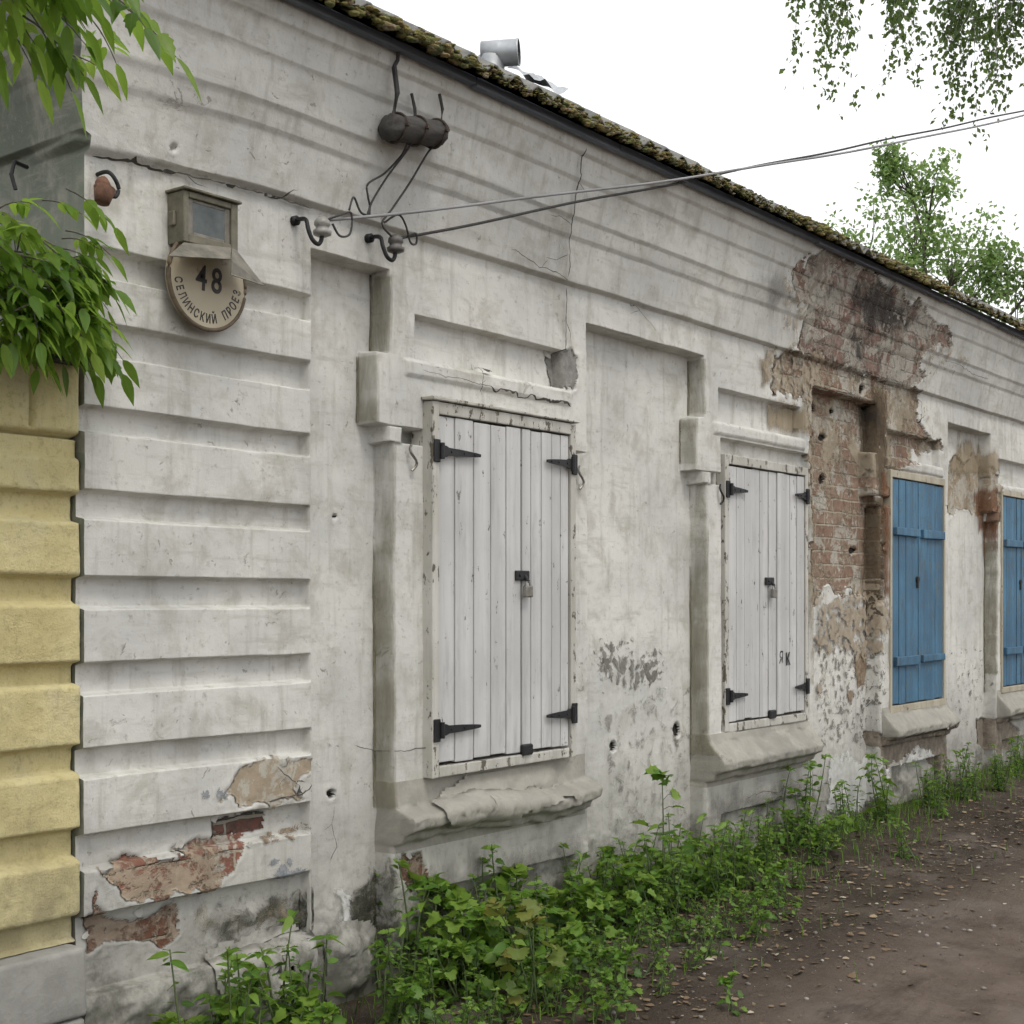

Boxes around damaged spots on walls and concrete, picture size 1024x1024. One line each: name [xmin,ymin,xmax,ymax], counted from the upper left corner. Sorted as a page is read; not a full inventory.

crack [93,156,309,208]
crack [511,148,587,354]
crack [425,367,571,407]
spalling [543,349,578,390]
spalling [757,249,1020,817]
peeling [594,637,665,715]
spalling [81,755,314,953]